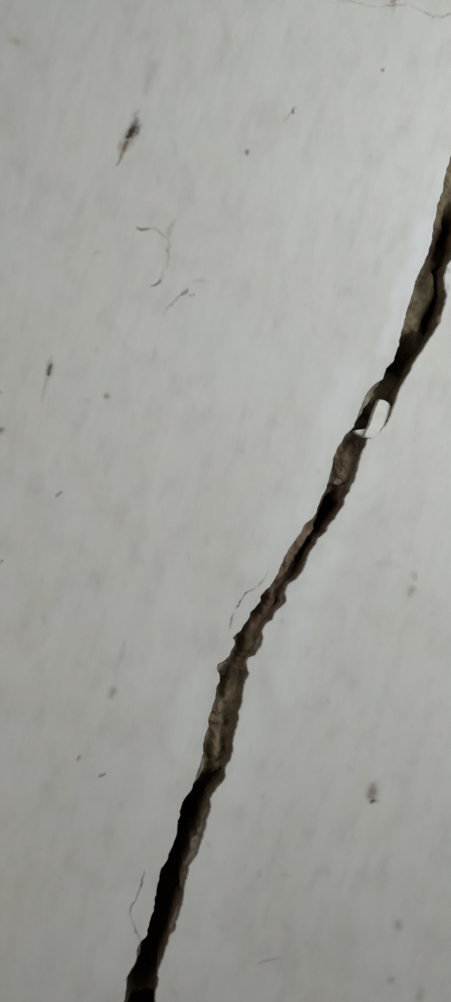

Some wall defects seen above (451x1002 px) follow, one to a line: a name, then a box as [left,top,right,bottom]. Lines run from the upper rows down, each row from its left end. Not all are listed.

crack [124,157,451,1002]